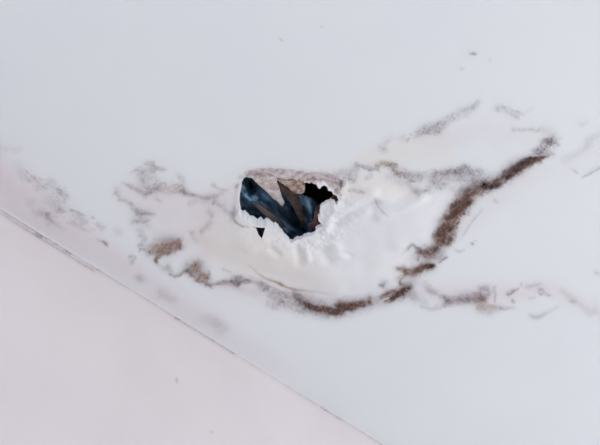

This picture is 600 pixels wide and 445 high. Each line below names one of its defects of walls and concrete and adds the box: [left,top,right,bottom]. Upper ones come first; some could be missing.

leakage [383,138,552,302]
leakage [299,299,371,316]